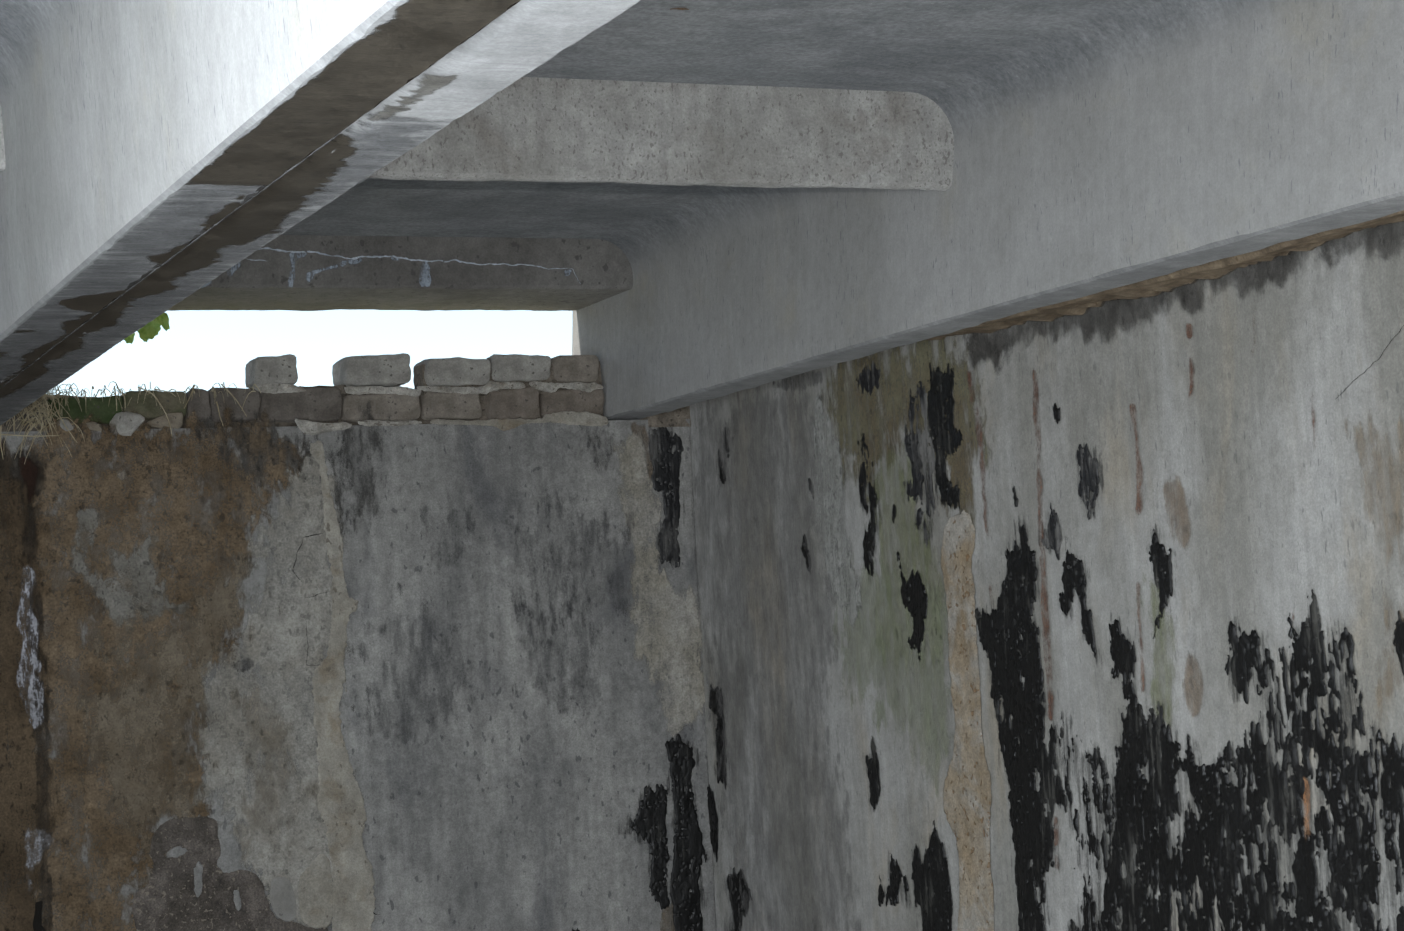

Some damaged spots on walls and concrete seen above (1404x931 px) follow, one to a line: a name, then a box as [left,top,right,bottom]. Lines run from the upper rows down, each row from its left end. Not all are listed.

crack [27,588,52,931]
water stain [0,0,521,931]
peeling [649,427,684,568]
peeling [619,684,727,931]
peeling [726,867,753,931]
peeling [856,361,1404,931]